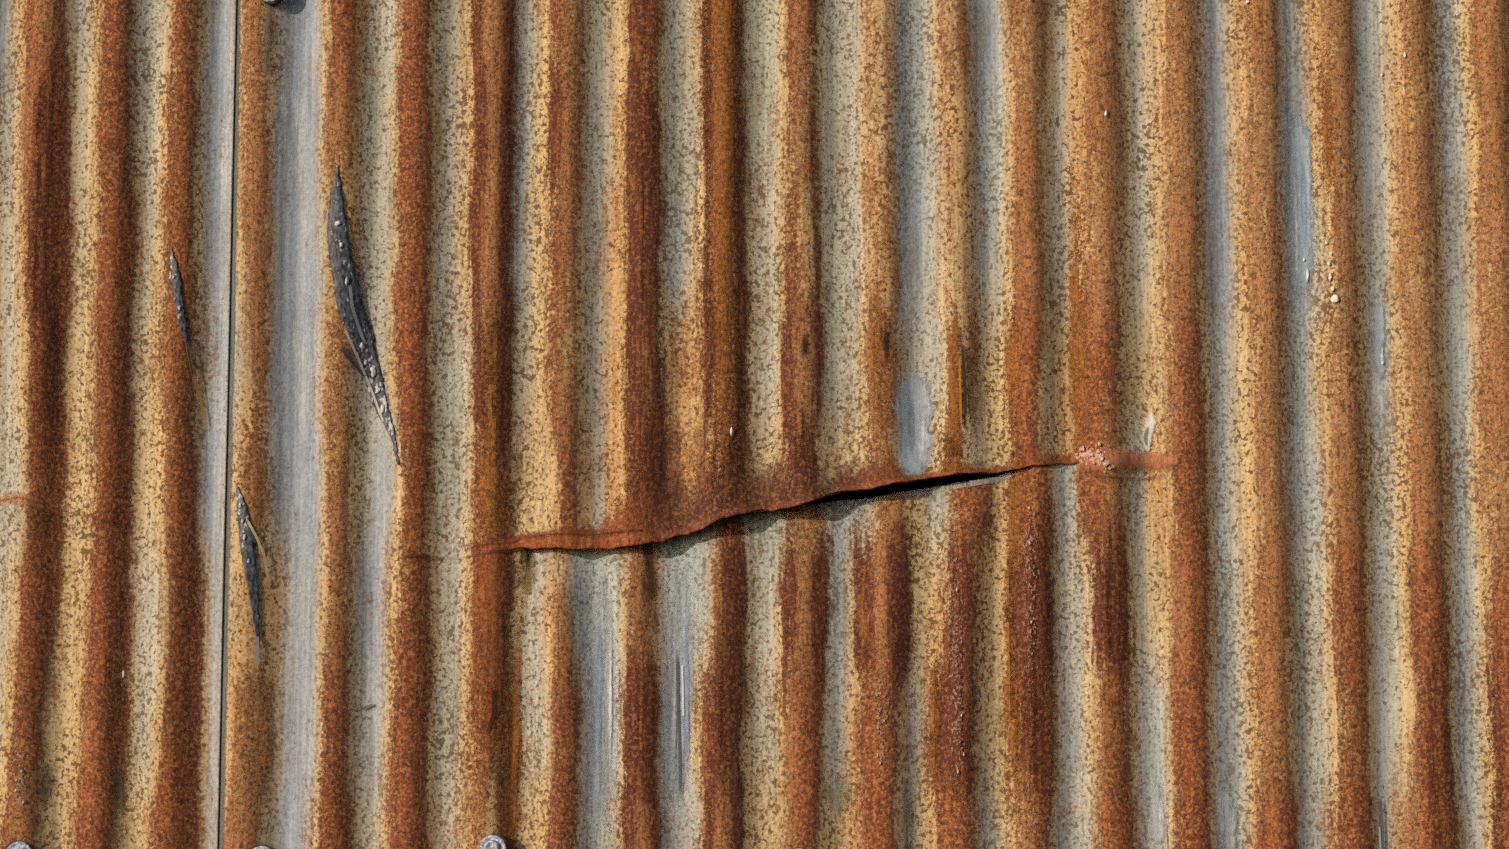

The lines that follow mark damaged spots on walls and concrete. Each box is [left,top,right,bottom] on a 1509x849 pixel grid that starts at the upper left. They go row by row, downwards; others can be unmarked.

rust [0,0,363,849]
rust [321,0,377,189]
rust [362,0,1509,849]